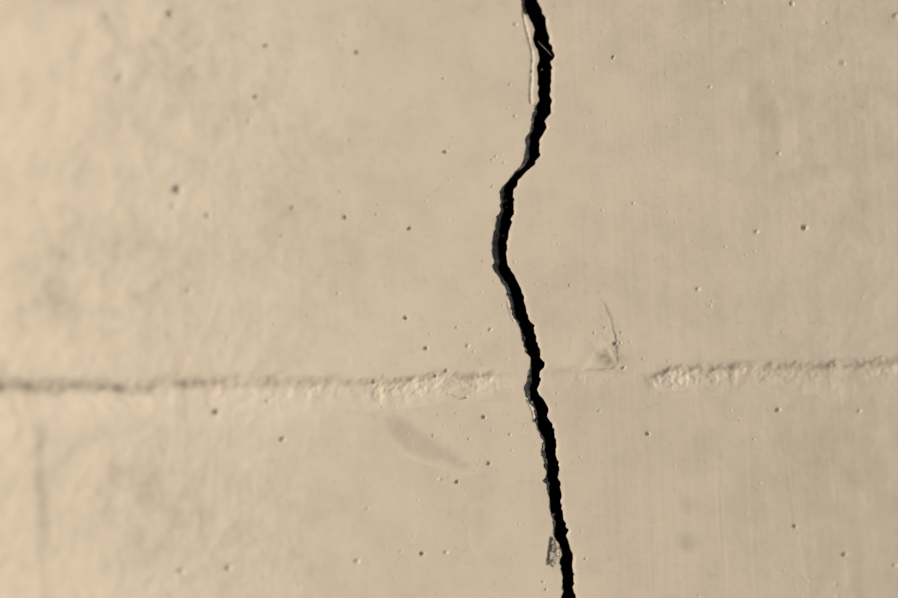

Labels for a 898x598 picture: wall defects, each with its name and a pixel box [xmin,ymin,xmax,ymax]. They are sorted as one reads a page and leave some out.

crack [492,0,580,598]